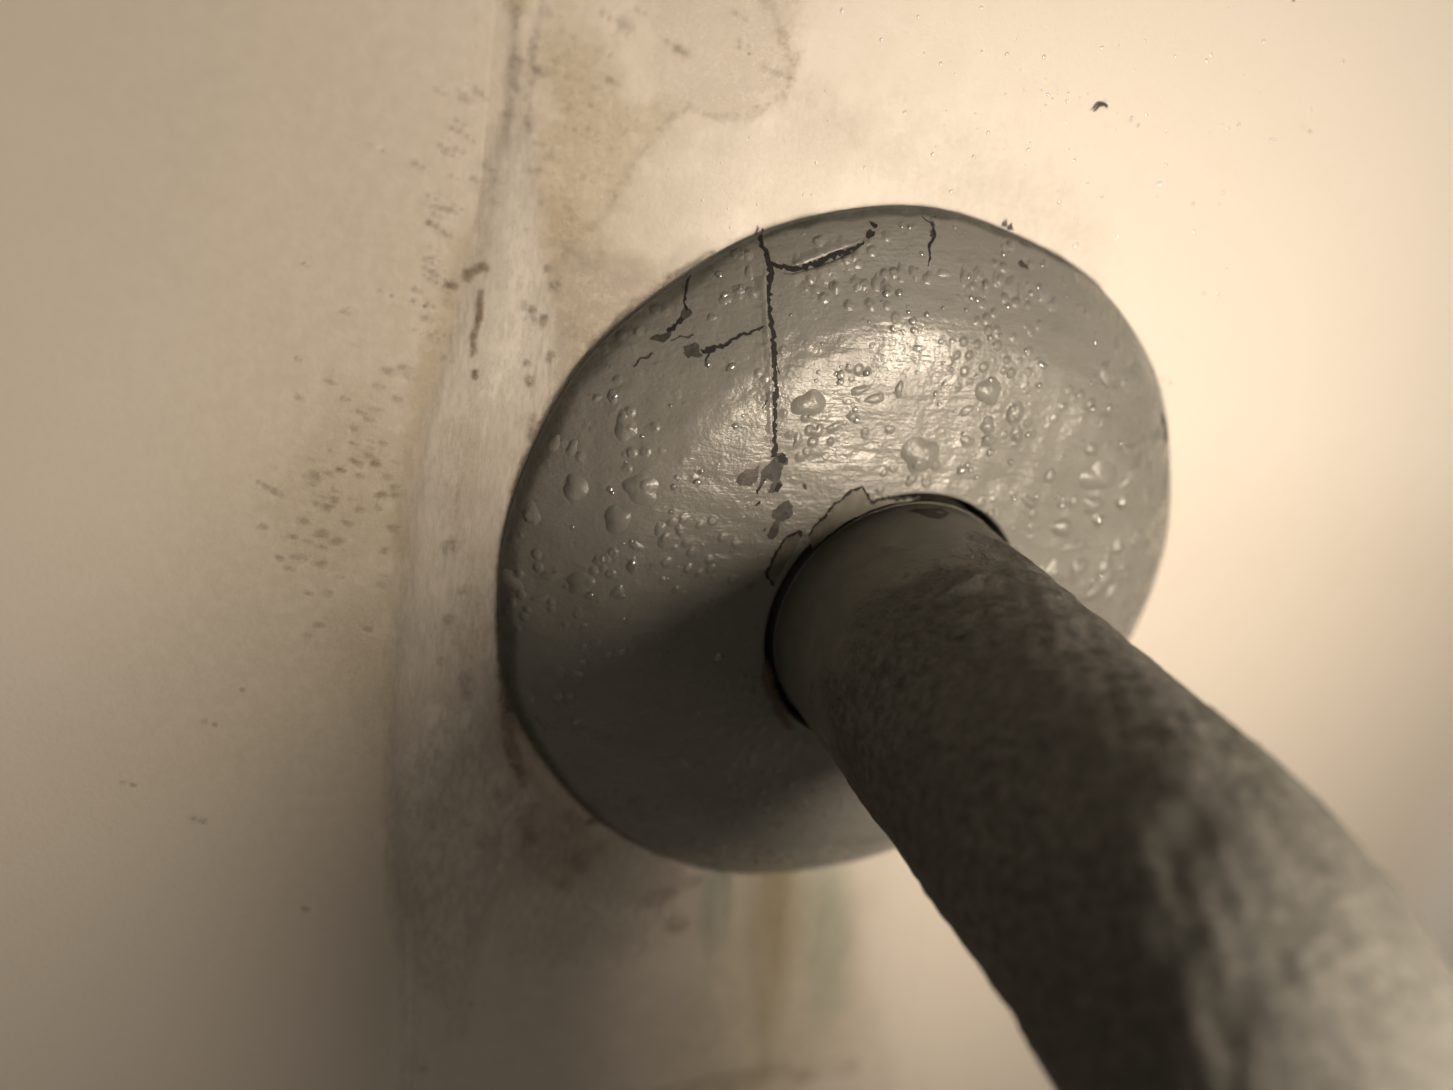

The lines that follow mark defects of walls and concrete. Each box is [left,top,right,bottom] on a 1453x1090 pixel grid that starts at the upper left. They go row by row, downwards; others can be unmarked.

crack [923,217,936,266]
crack [634,221,878,458]
peeling [736,452,949,586]